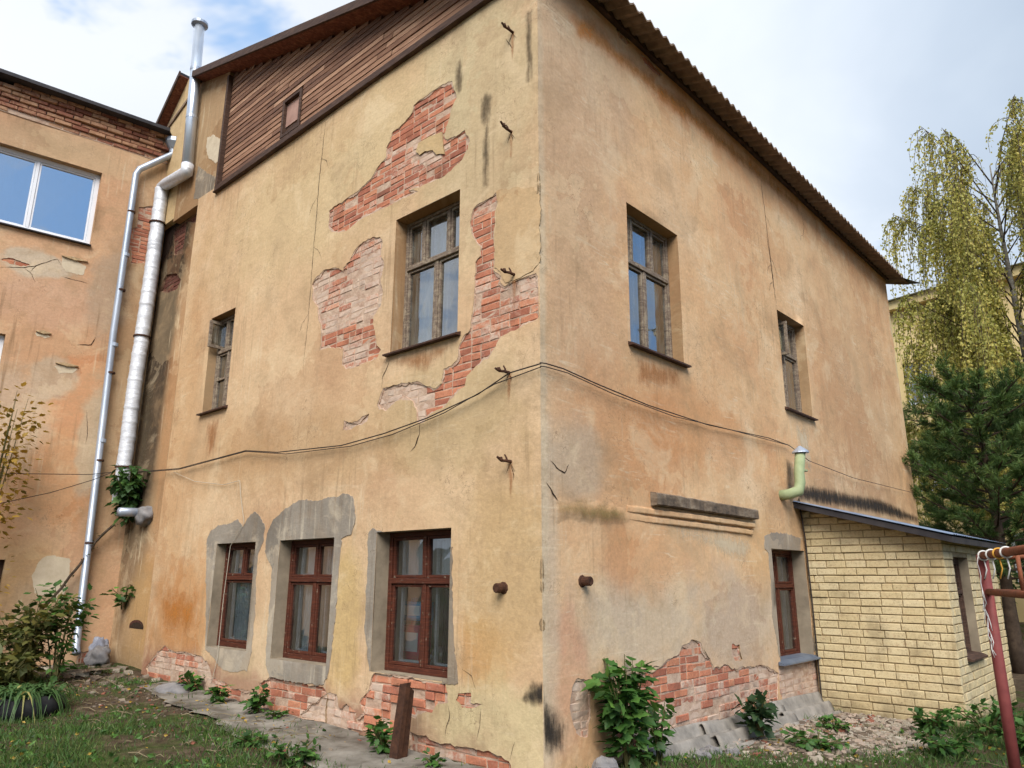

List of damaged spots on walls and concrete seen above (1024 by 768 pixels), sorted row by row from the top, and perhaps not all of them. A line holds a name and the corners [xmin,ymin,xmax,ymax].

spalling [328,81,470,233]
spalling [2,258,30,266]
peeling [62,255,88,275]
spalling [312,237,384,369]
spalling [343,193,539,430]
leakage [800,487,917,521]
spalling [146,645,481,735]
leakage [524,684,561,748]
spalling [615,640,819,750]